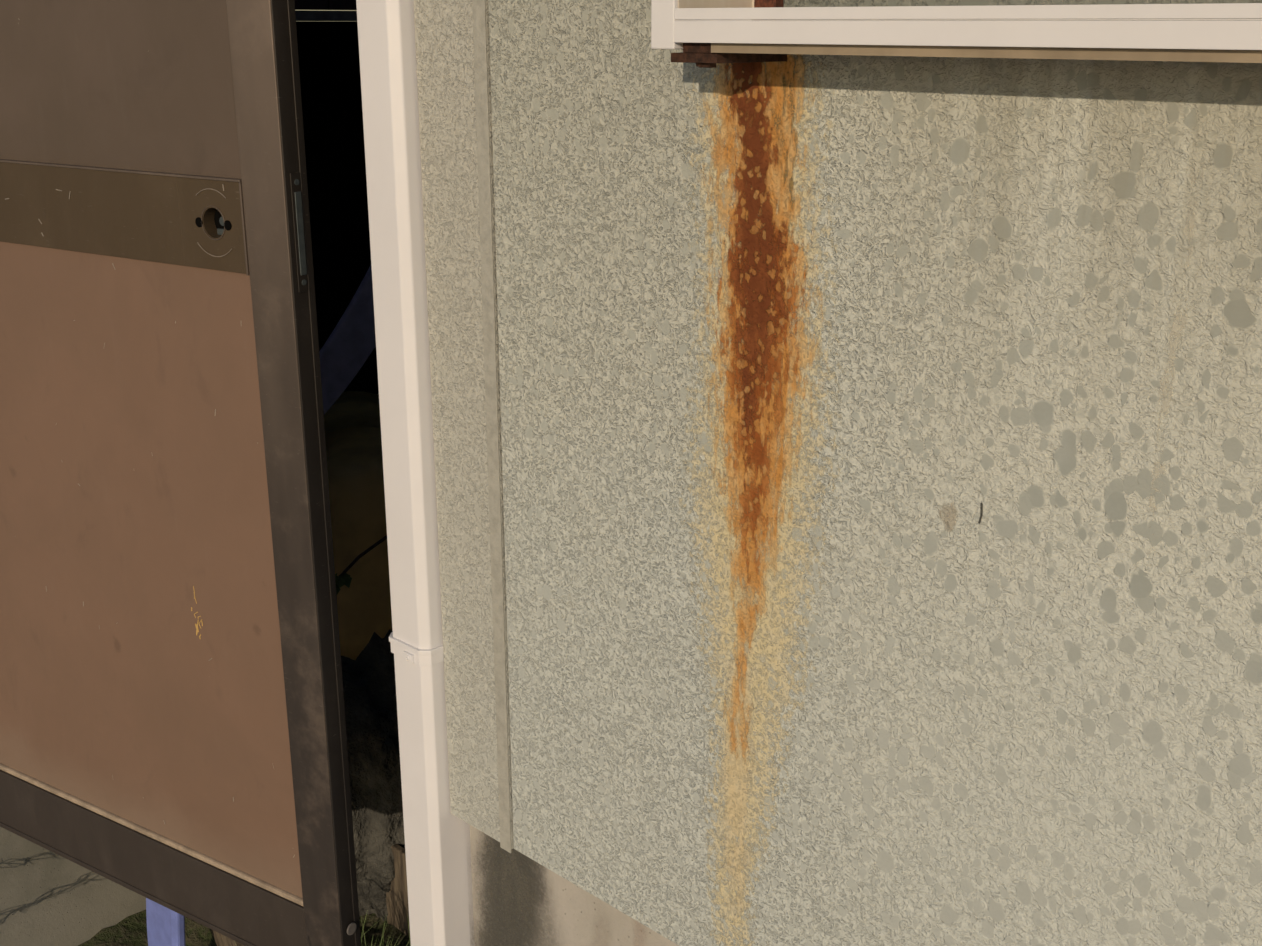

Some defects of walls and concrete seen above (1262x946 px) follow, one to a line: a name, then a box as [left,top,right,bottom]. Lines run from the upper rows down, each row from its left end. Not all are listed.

corrosion [671,43,840,946]